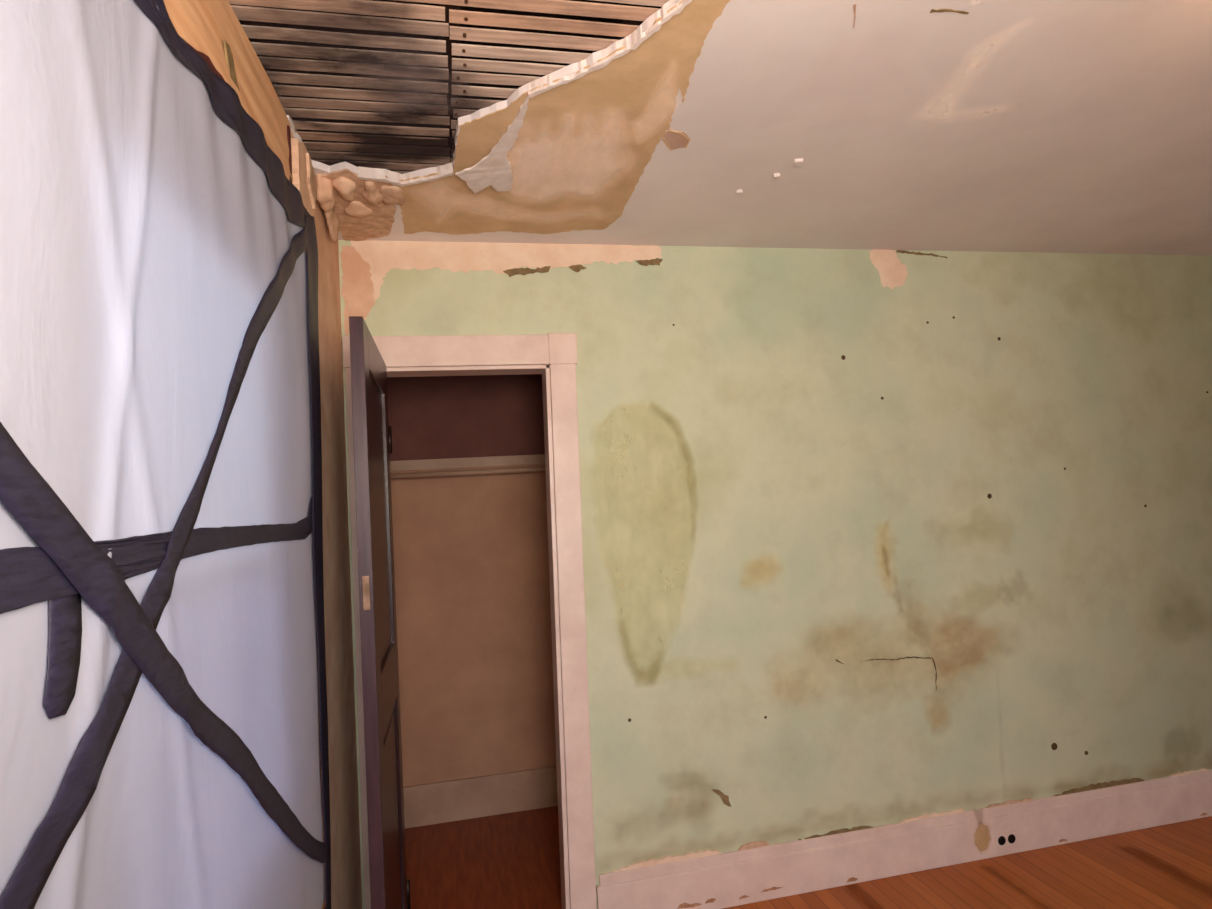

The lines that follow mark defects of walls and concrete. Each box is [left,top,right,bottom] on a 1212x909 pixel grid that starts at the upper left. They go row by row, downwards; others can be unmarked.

leakage [259,4,477,168]
flaking render [315,0,730,336]
peeling [869,249,947,290]